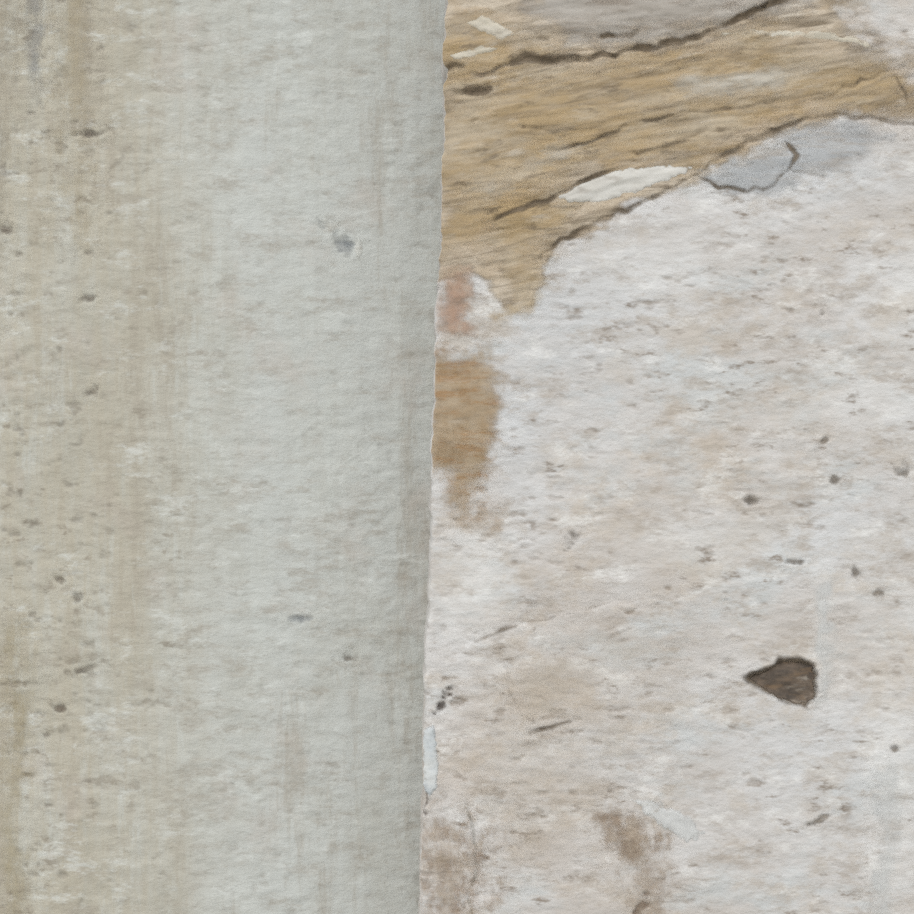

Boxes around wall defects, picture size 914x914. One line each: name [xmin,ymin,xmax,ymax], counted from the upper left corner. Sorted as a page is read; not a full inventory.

crack [593,0,788,58]
crack [447,52,571,95]
flaking render [443,0,886,118]
flaking render [438,86,841,309]
spalling [745,658,817,707]